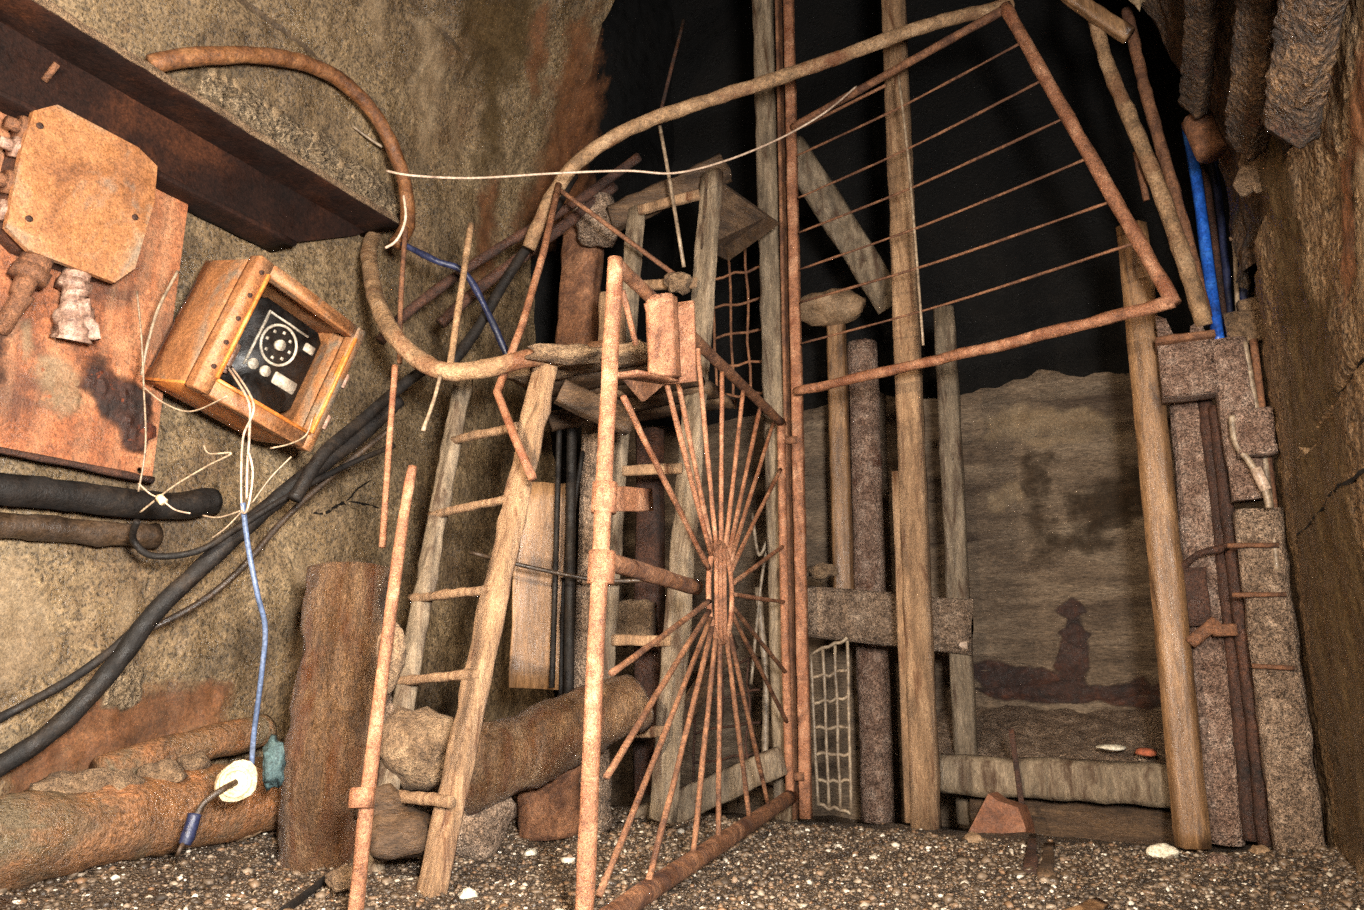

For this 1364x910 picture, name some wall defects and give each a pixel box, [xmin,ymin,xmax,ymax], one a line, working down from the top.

corrosion [0,112,11,171]
corrosion [0,189,188,484]
crack [1337,357,1364,397]
crack [1295,468,1364,544]